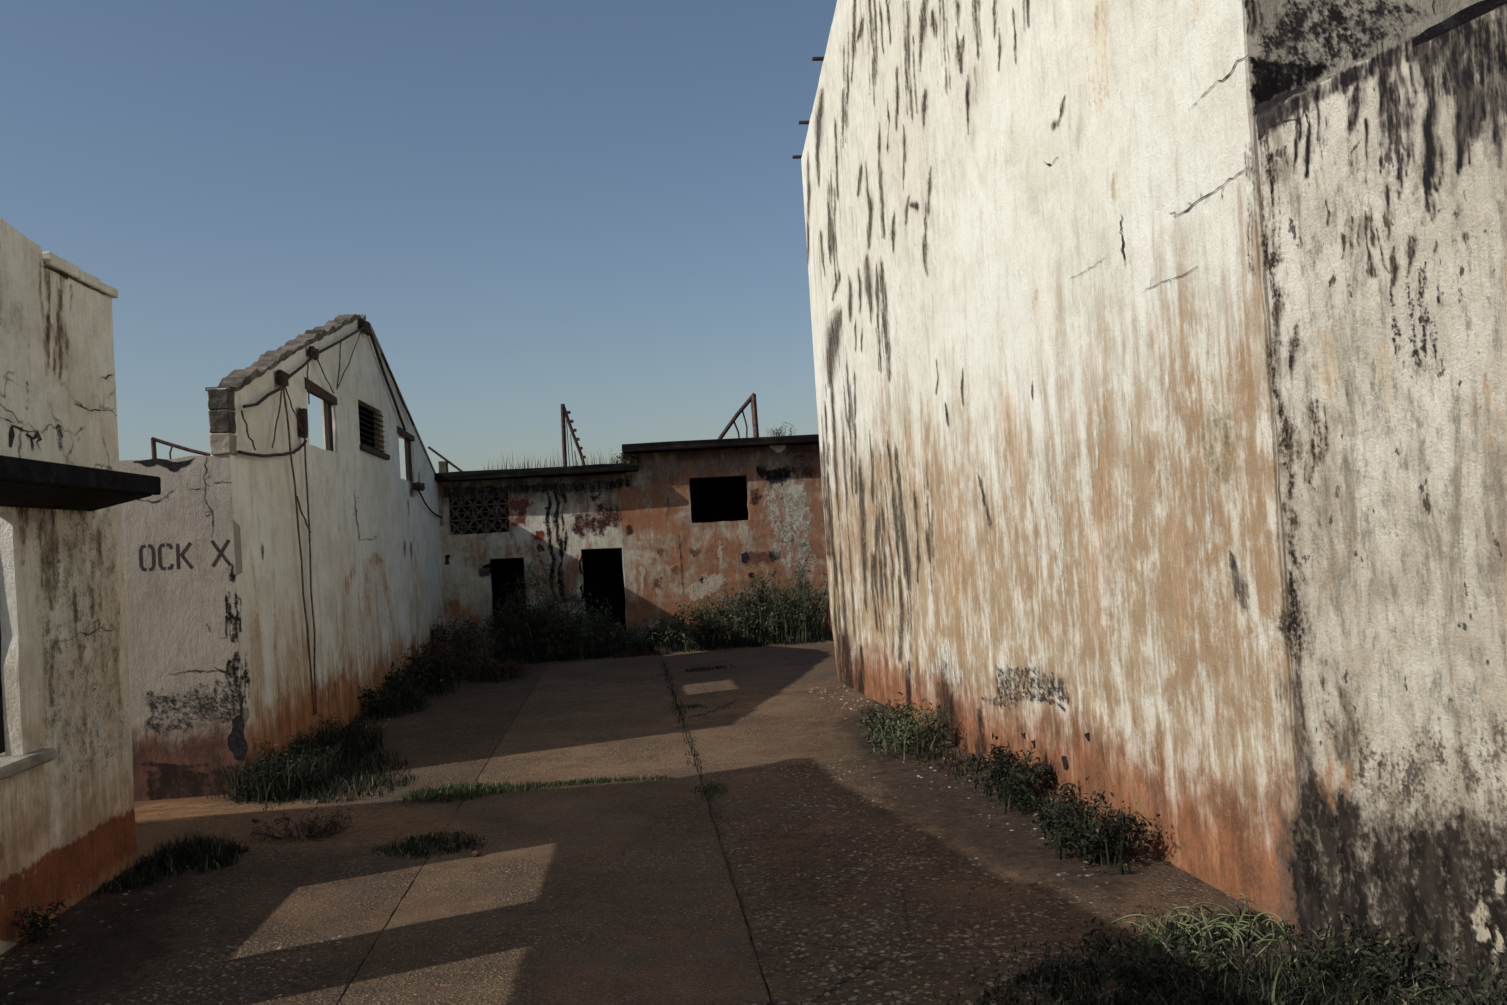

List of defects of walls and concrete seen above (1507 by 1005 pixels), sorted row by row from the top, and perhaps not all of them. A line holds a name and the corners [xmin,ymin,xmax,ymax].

crack [1189,55,1248,110]
crack [1273,94,1310,143]
crack [1169,165,1250,217]
crack [45,265,107,295]
crack [1069,216,1198,292]
crack [1,417,42,451]
water stain [443,0,1154,907]
corrosion [515,530,545,555]
peeling [572,493,634,601]
peeling [639,479,815,600]
water stain [1244,0,1507,1005]
water stain [19,507,301,786]